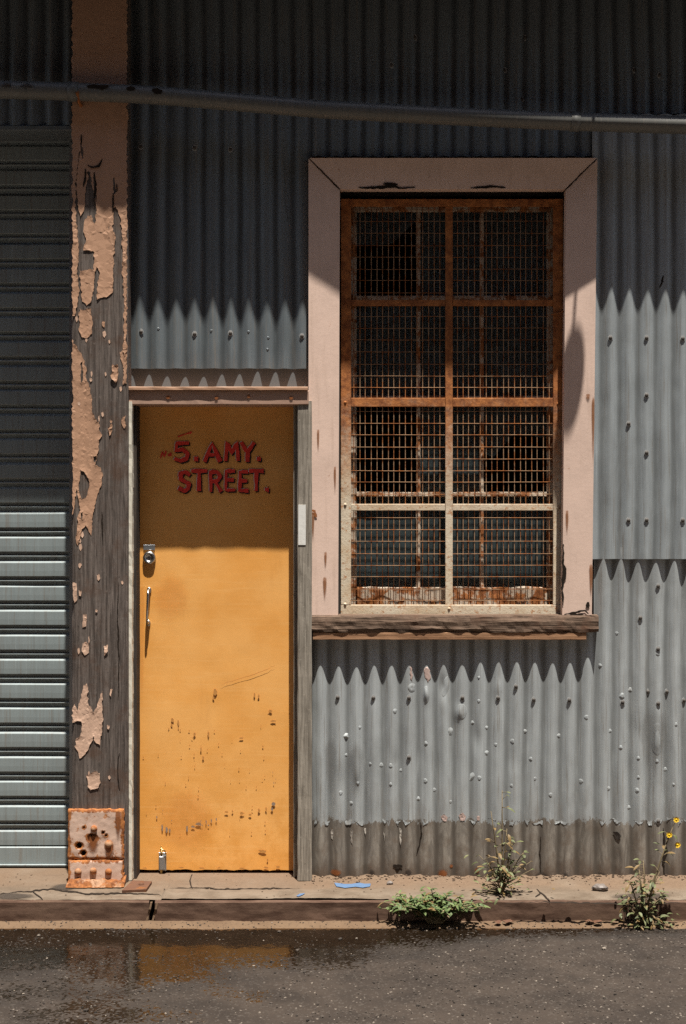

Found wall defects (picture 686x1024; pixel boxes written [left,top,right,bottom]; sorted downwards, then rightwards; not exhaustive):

peeling [71,0,136,568]
peeling [78,610,98,655]
peeling [72,684,112,758]
peeling [86,771,111,790]
corrosion [89,836,113,855]